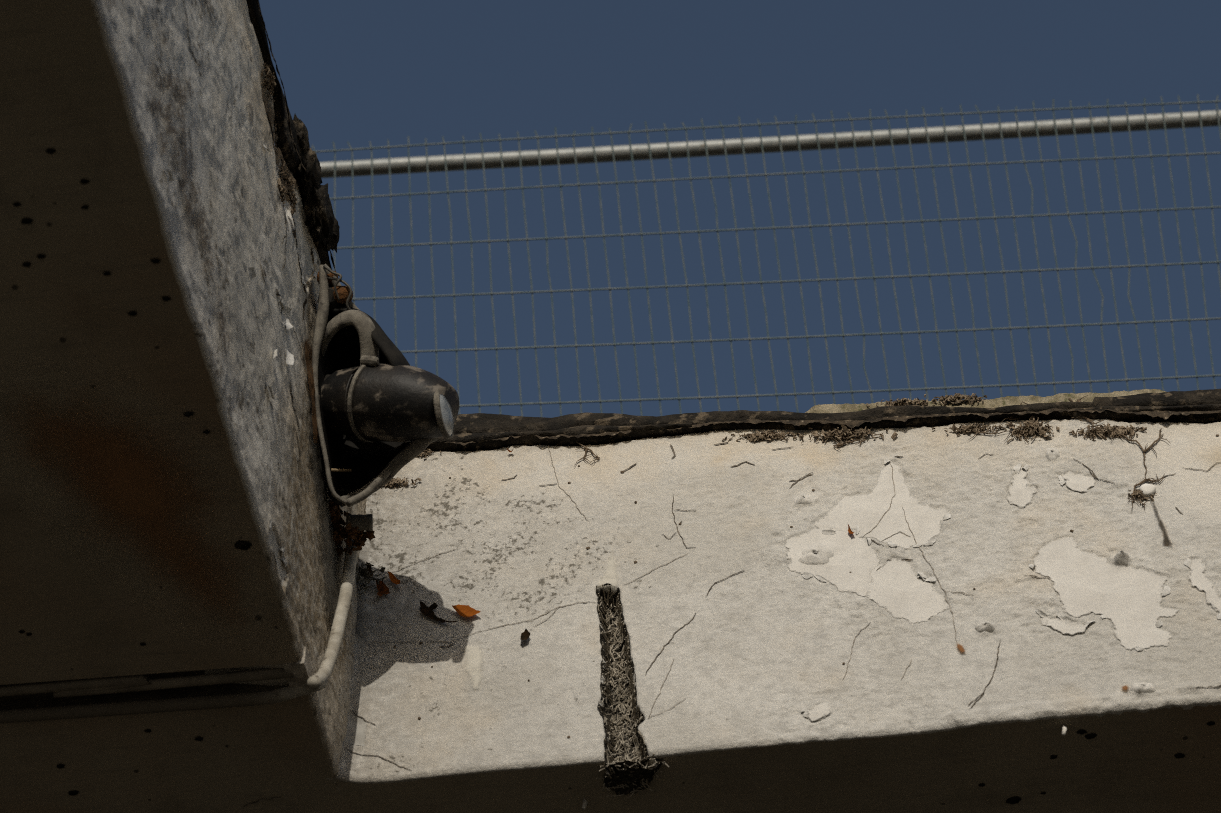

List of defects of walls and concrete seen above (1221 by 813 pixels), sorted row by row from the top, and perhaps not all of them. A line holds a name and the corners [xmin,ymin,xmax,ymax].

damp [150,6,215,284]
peeling [786,459,952,623]
peeling [1007,464,1037,507]
peeling [1057,471,1095,492]
peeling [1029,537,1179,651]
peeling [1184,558,1221,619]